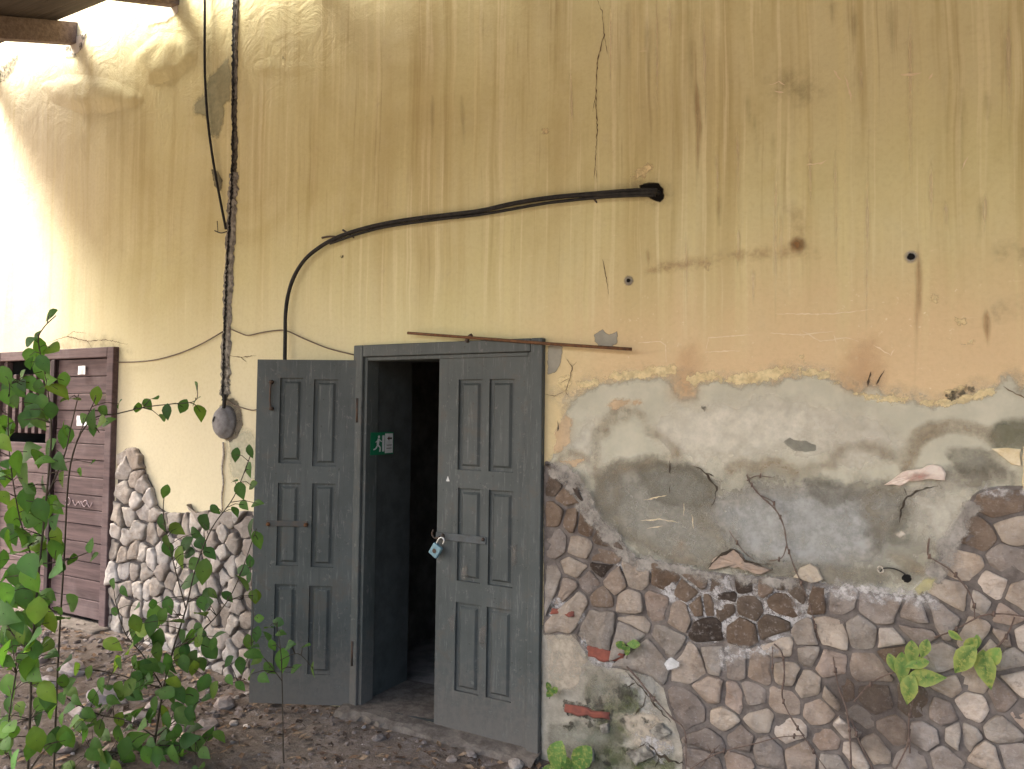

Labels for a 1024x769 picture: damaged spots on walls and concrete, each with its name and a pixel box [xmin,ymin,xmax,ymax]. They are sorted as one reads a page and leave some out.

crack [593,0,607,178]
spalling [594,329,617,346]
flaking render [550,366,1024,595]